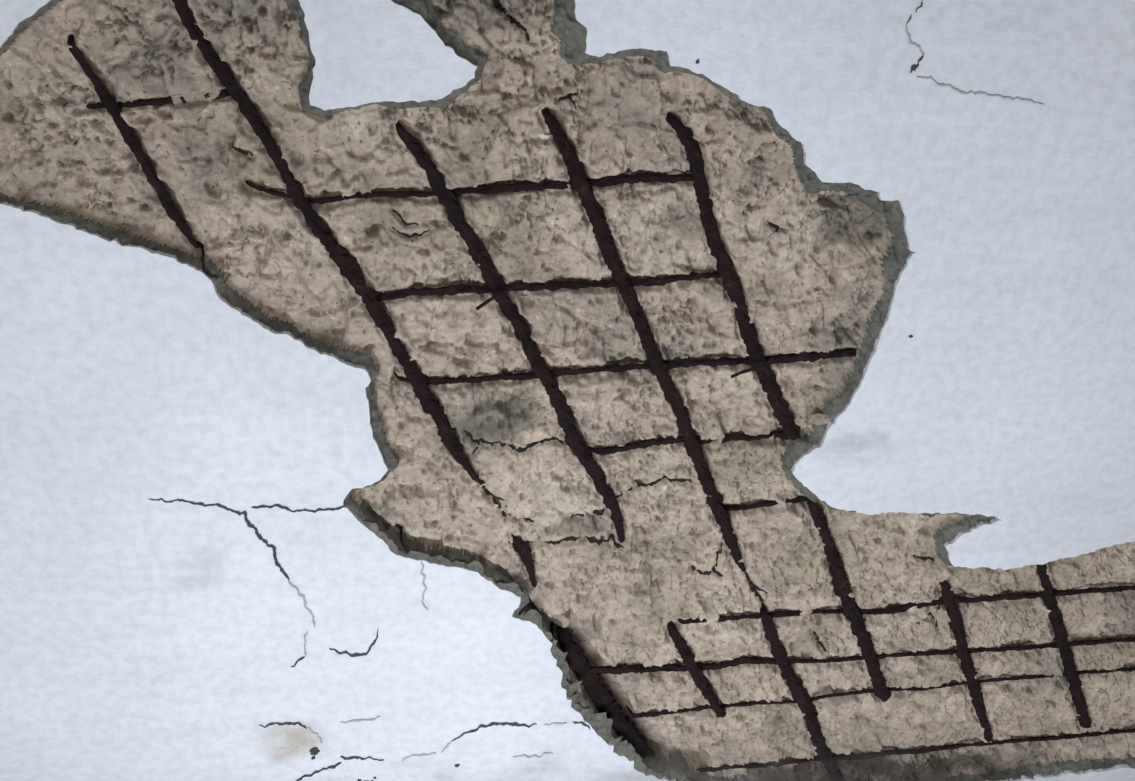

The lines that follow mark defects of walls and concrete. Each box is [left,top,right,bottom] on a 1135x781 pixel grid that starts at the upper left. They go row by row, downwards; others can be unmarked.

crack [905,2,1043,105]
spalling [0,0,847,781]
crack [149,498,378,667]
crack [259,716,590,781]
spalling [832,580,1135,781]
spalling [1036,542,1135,728]